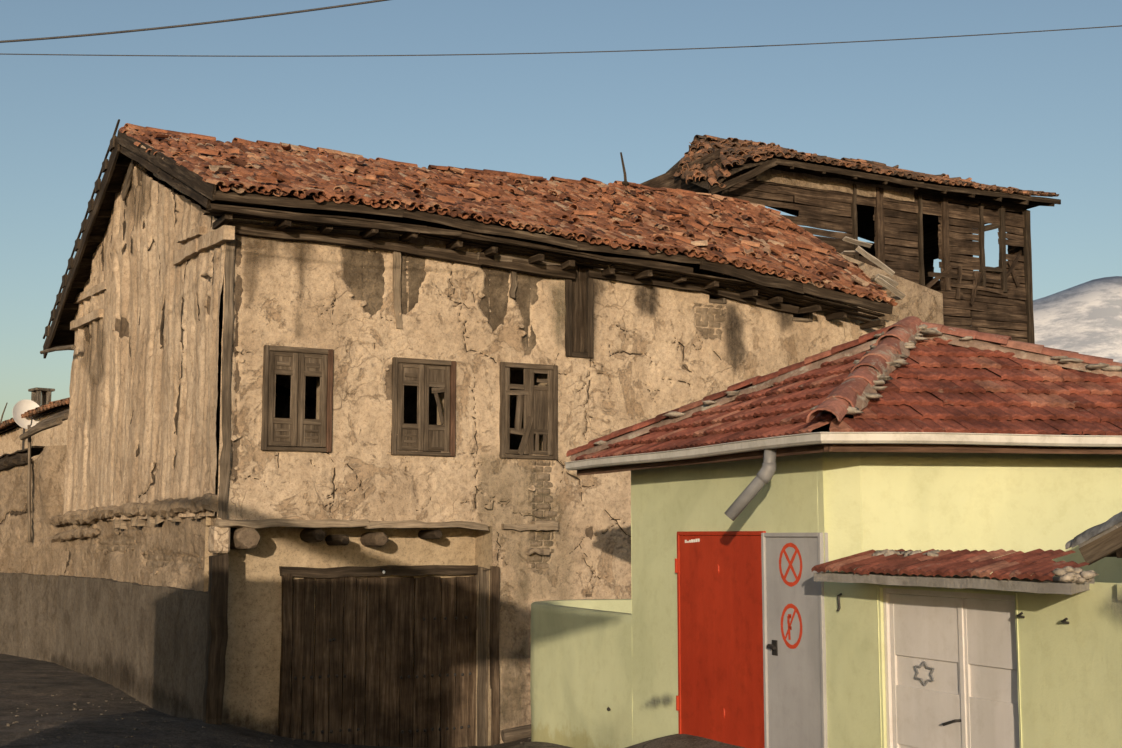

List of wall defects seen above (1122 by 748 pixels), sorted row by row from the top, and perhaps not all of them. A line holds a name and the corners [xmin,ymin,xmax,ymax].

crack [101,179,214,498]
peeling [341,246,385,318]
peeling [399,253,432,315]
peeling [477,265,560,356]
crack [439,264,631,588]
peeling [526,461,557,575]